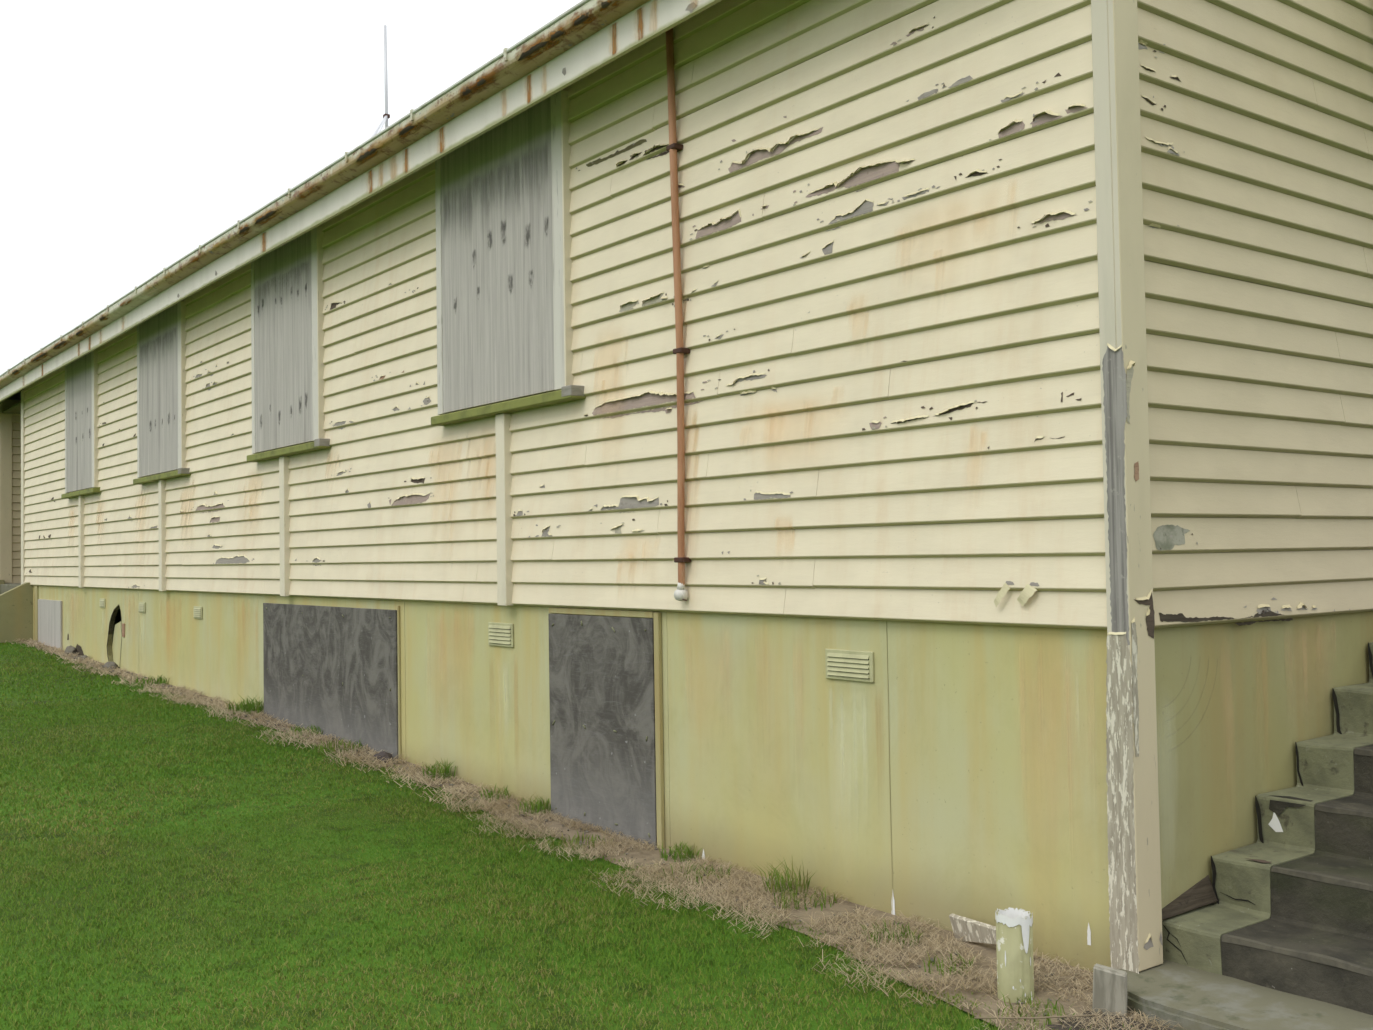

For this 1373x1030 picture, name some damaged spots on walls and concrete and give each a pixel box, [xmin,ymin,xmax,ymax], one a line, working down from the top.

corrosion [521,0,620,103]
corrosion [460,69,498,101]
corrosion [360,143,384,192]
corrosion [398,123,421,172]
peeling [718,126,823,173]
peeling [690,204,769,240]
peeling [793,158,1002,258]
peeling [584,369,777,419]
peeling [180,491,254,564]
peeling [388,477,434,506]
peeling [589,495,668,534]
peeling [1102,343,1139,757]